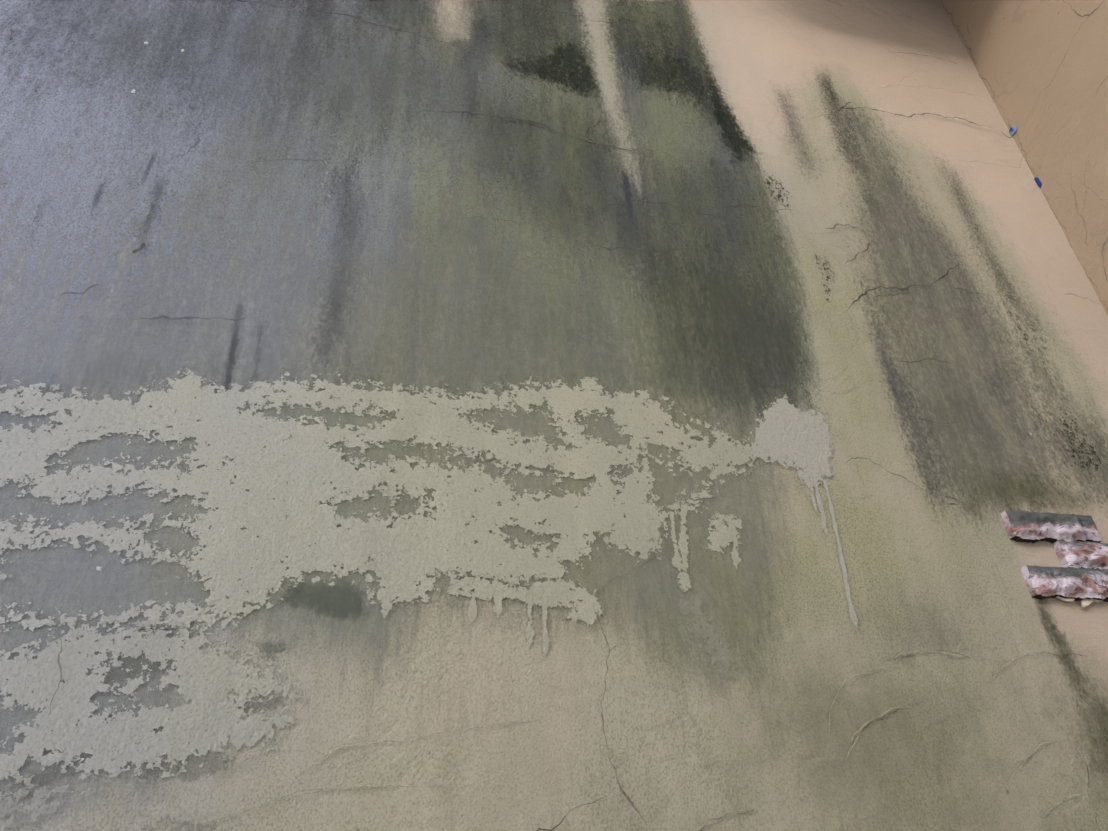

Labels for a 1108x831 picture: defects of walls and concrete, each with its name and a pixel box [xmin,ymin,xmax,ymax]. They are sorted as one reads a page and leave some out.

water stain [0,0,808,671]
water stain [819,79,1104,518]
water stain [0,679,93,784]
water stain [0,409,211,726]
crack [537,608,646,831]
water stain [1040,599,1070,666]